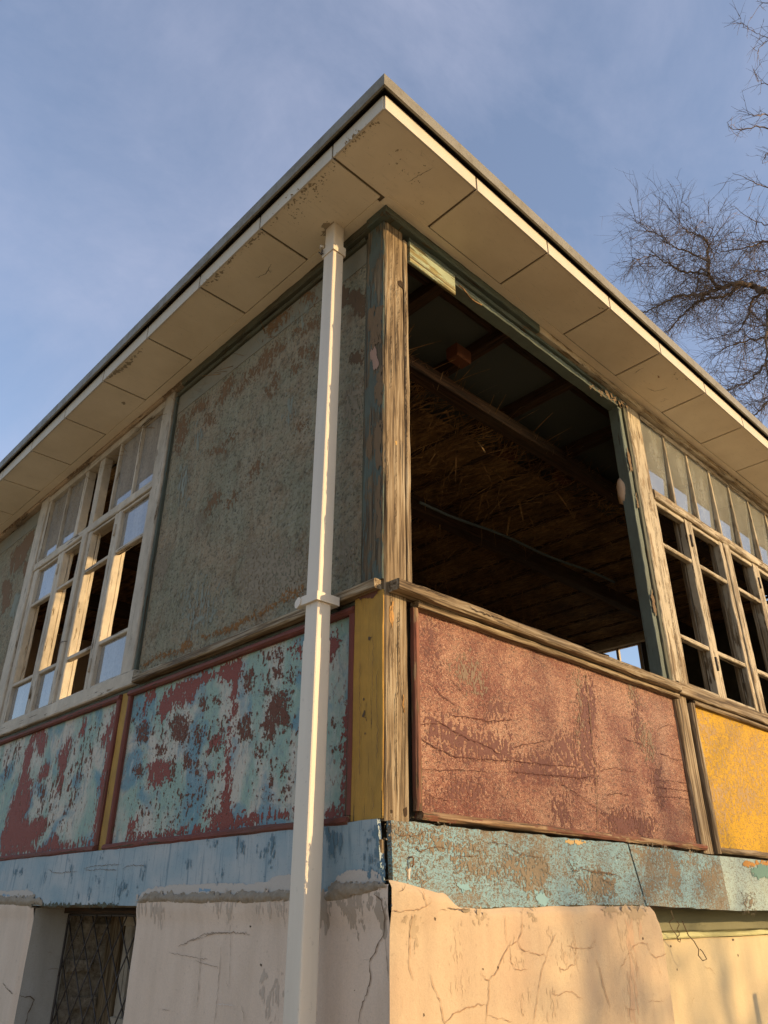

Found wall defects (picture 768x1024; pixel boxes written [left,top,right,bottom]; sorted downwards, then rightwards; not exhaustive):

peeling [329,628,343,663]
peeling [0,708,116,856]
peeling [125,638,302,842]
peeling [324,699,347,818]
peeling [385,671,602,913]
peeling [561,759,721,910]
crack [358,828,665,1024]